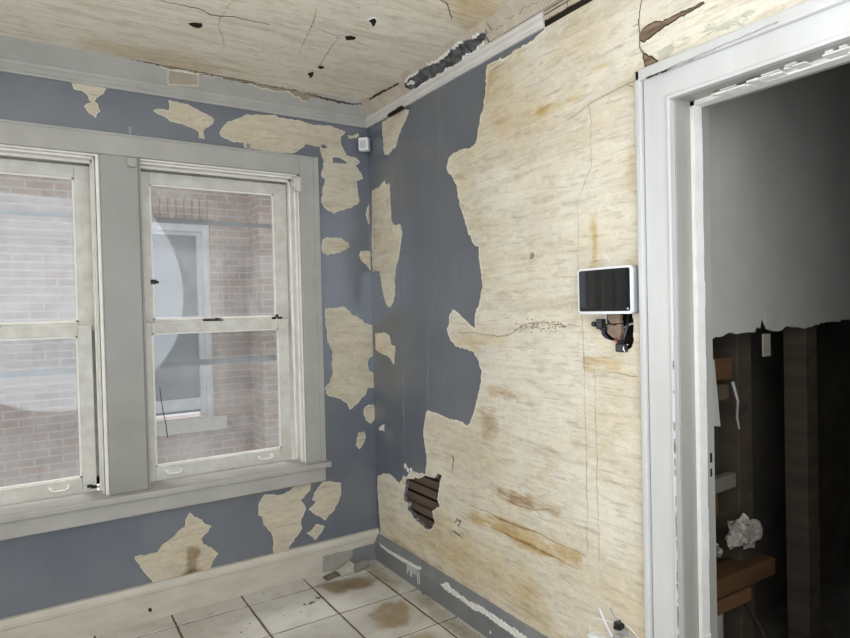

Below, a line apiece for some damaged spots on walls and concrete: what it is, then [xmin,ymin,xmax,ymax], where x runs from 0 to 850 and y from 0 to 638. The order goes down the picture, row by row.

peeling [72,83,107,118]
peeling [154,100,214,139]
crack [163,1,270,44]
crack [117,56,399,105]
crack [477,0,581,43]
crack [568,0,778,267]
peeling [822,44,850,60]
peeling [219,114,402,307]
peeling [377,0,813,638]
peeling [325,307,395,431]
peeling [134,513,218,582]
peeling [258,481,341,553]